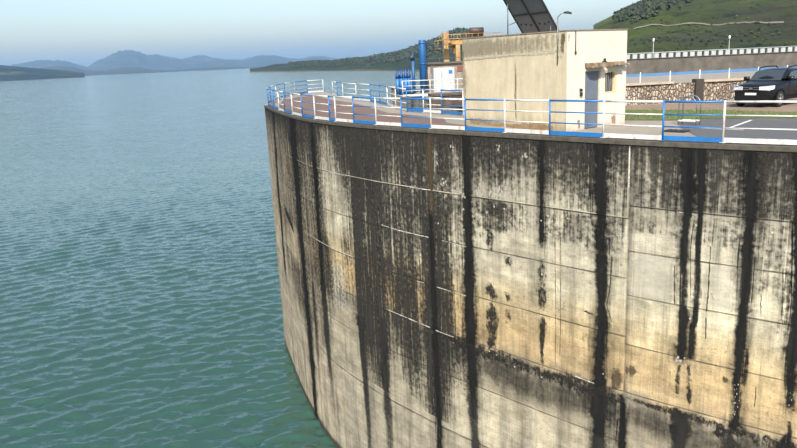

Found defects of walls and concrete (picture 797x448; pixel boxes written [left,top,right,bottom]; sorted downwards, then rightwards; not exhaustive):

water stain [265,108,797,448]